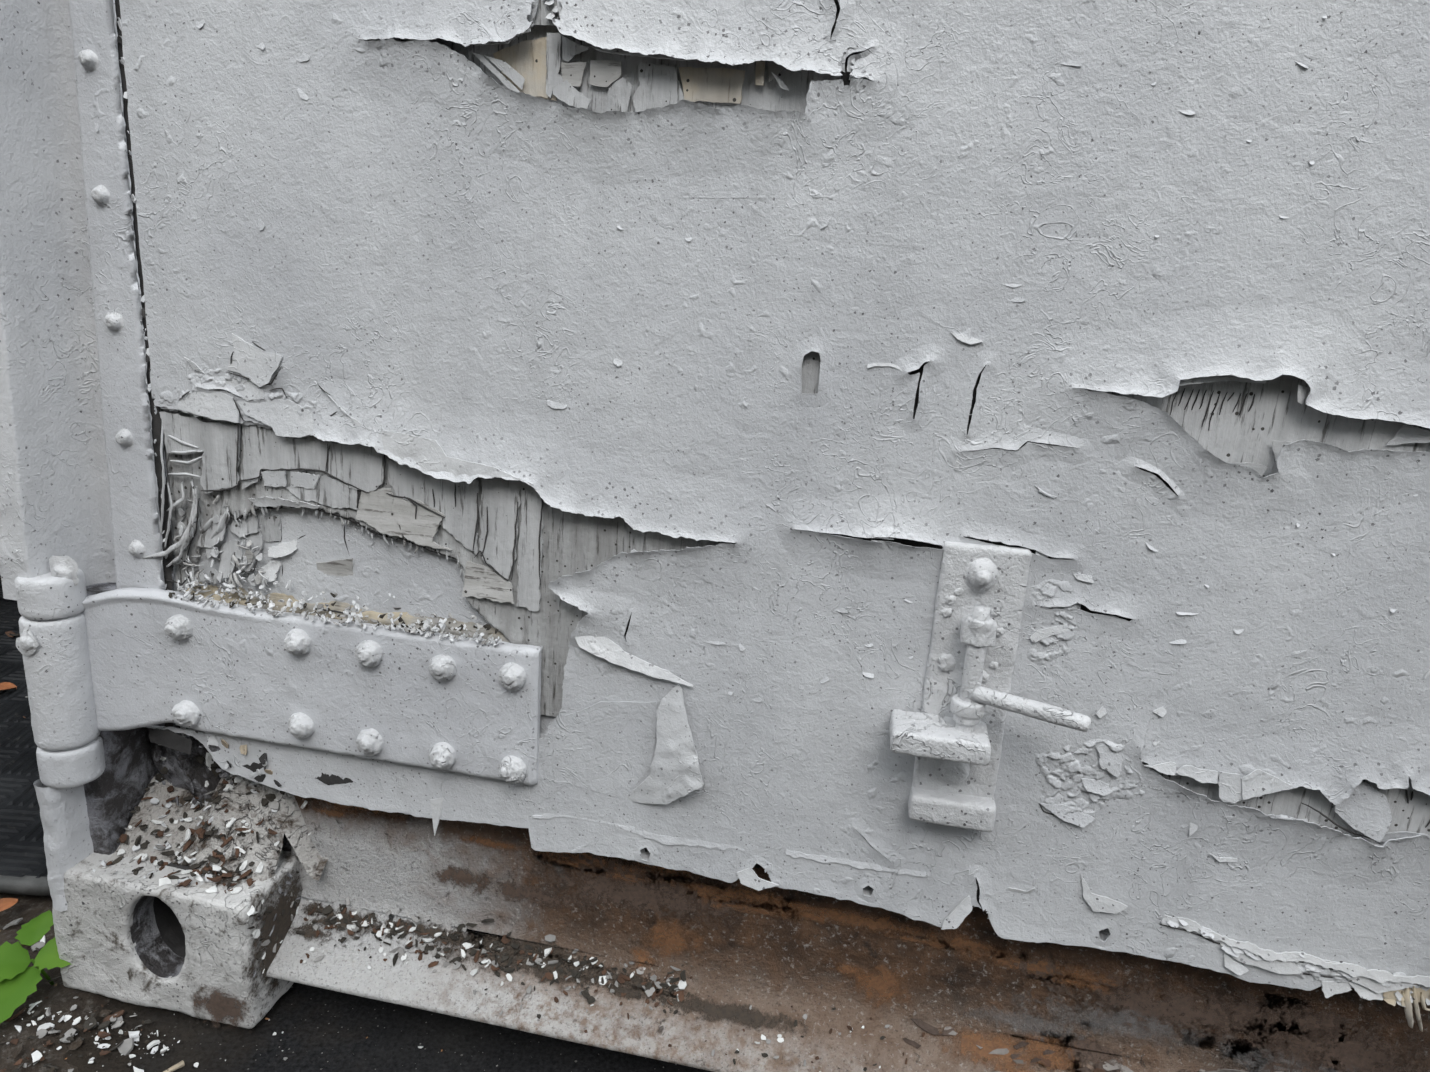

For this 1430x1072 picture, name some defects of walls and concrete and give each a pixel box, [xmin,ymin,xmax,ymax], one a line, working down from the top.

peeling [295,0,931,185]
crack [816,0,879,89]
crack [891,344,1186,510]
peeling [1014,304,1430,532]
crack [775,494,1156,641]
rust [137,817,280,890]
rust [315,798,401,821]
peeling [532,621,704,809]
peeling [1035,704,1430,890]
rust [193,984,252,1028]
rust [433,835,1430,1072]
peeling [1160,915,1430,1007]